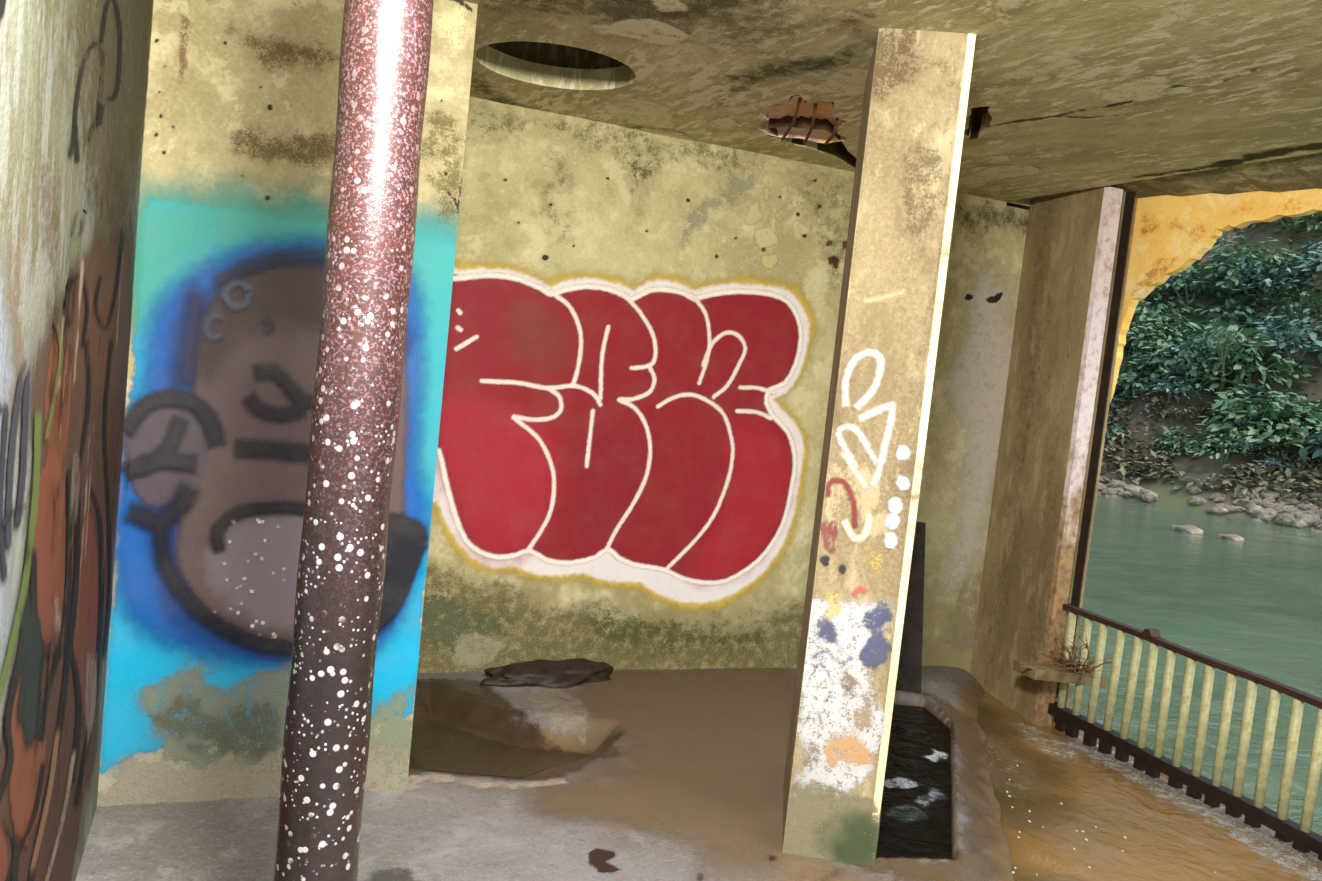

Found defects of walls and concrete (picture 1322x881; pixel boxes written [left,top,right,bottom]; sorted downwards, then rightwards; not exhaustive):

rust [179,16,189,75]
damp [247,38,338,67]
damp [432,3,476,59]
damp [486,0,790,43]
peeling [591,0,690,45]
damp [728,49,854,89]
damp [66,0,154,236]
damp [232,129,335,164]
damp [423,112,460,213]
damp [472,78,534,132]
spalling [602,68,869,168]
spalling [966,106,989,139]